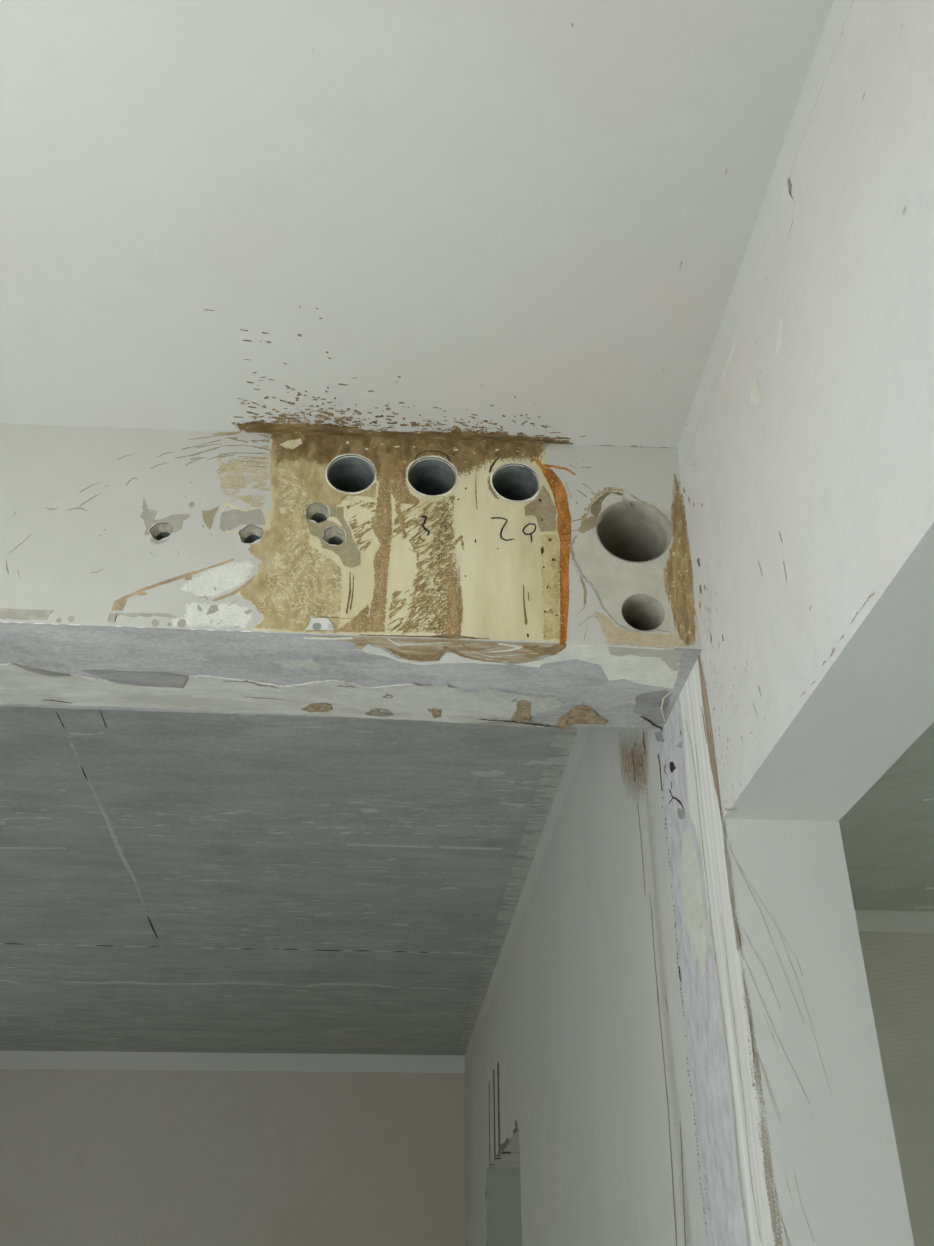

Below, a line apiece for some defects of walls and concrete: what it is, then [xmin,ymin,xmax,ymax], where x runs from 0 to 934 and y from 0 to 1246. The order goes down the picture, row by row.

peeling [140,482,268,557]
peeling [305,504,361,568]
spalling [325,454,377,494]
corrosion [188,359,625,644]
spalling [407,456,458,496]
spalling [487,463,541,501]
peeling [108,613,186,628]
peeling [0,663,609,730]
spalling [634,690,672,729]
crack [0,700,160,947]
crack [200,946,472,954]